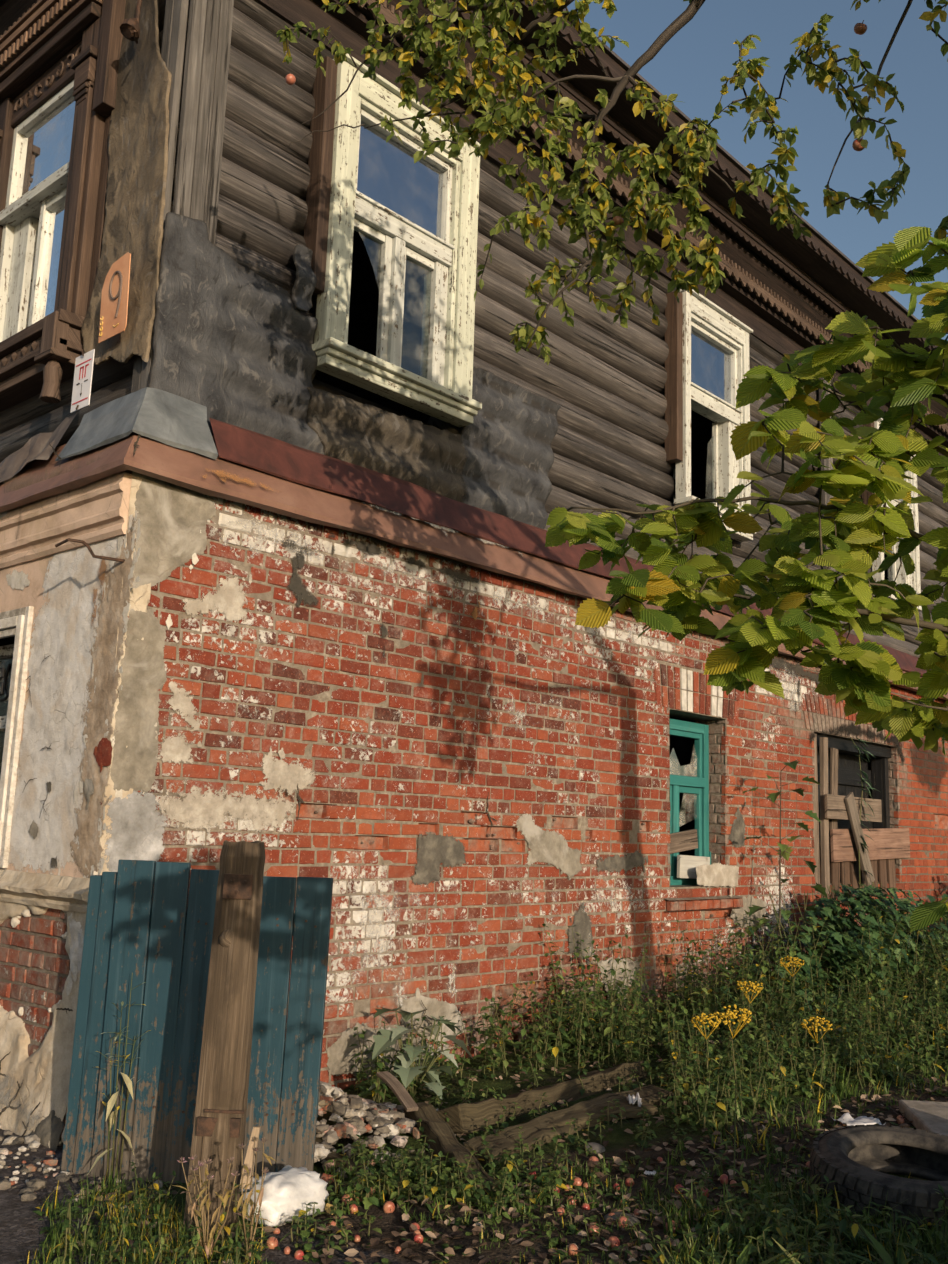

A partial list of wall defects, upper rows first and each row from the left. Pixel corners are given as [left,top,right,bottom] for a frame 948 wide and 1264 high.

leakage [240,522,394,578]
leakage [407,557,425,584]
leakage [439,567,480,583]
peeling [5,478,216,878]
flaking render [11,909,31,928]
peeling [47,913,84,1012]
crack [0,1052,40,1136]